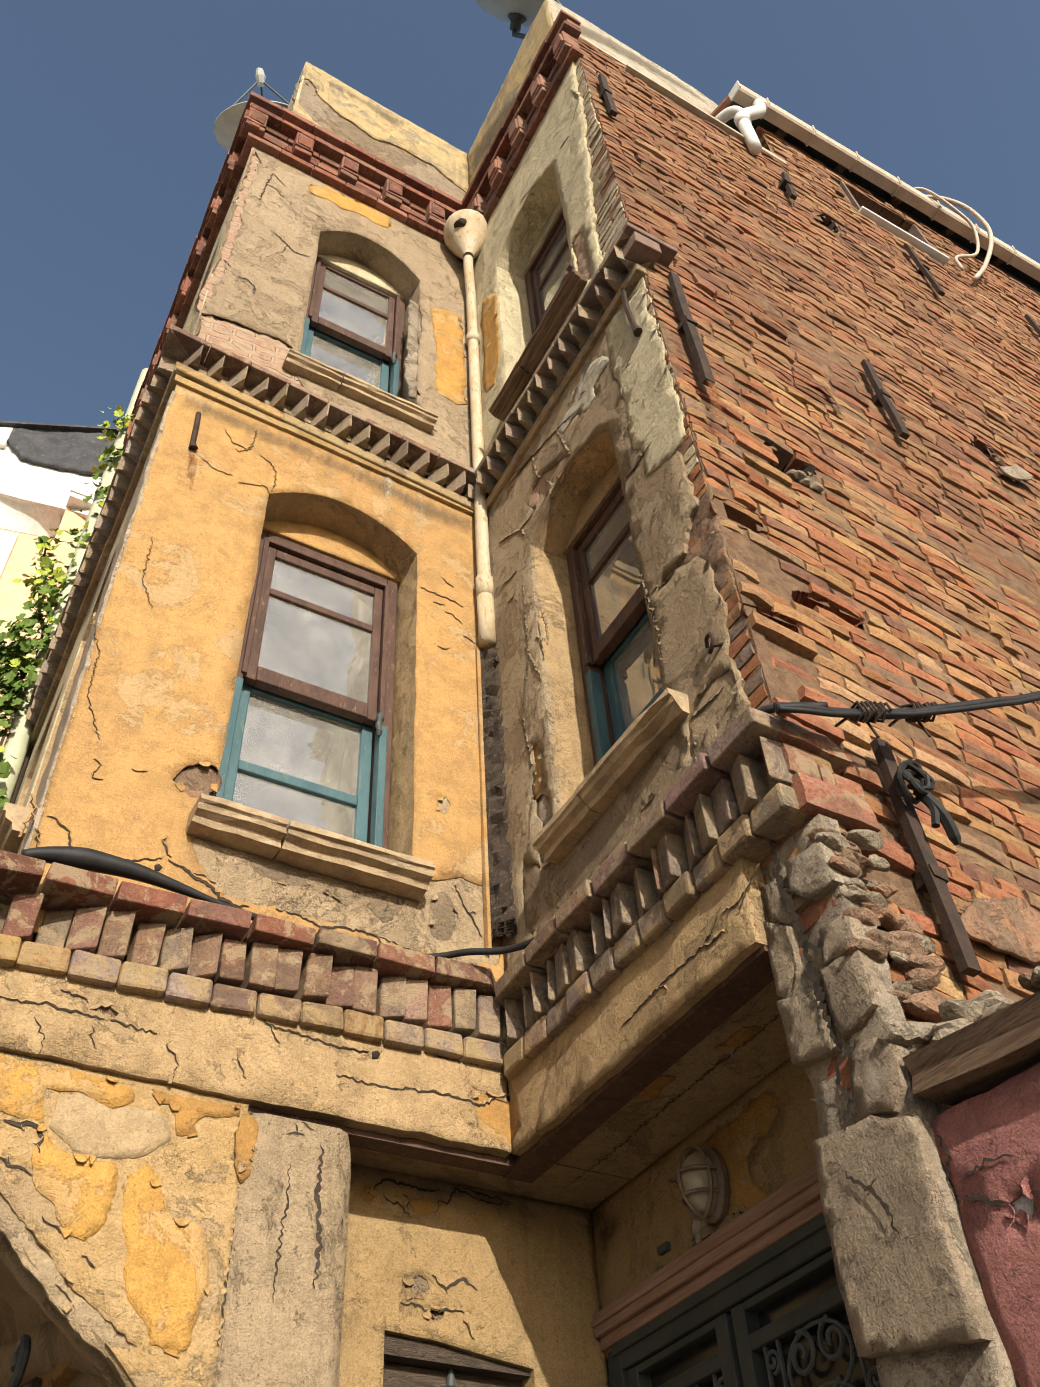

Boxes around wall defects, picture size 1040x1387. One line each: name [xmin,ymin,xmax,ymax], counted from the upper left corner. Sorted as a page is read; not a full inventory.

flaking render [308,184,392,228]
flaking render [403,293,500,405]
flaking render [556,281,686,476]
crack [18,793,74,847]
crack [0,988,180,1084]
crack [264,1020,509,1106]
crack [621,841,859,1119]
spalling [807,828,948,1020]
flaking render [959,897,1040,964]
flaking render [0,1054,259,1359]
crack [273,1122,344,1303]
crack [400,1272,478,1340]